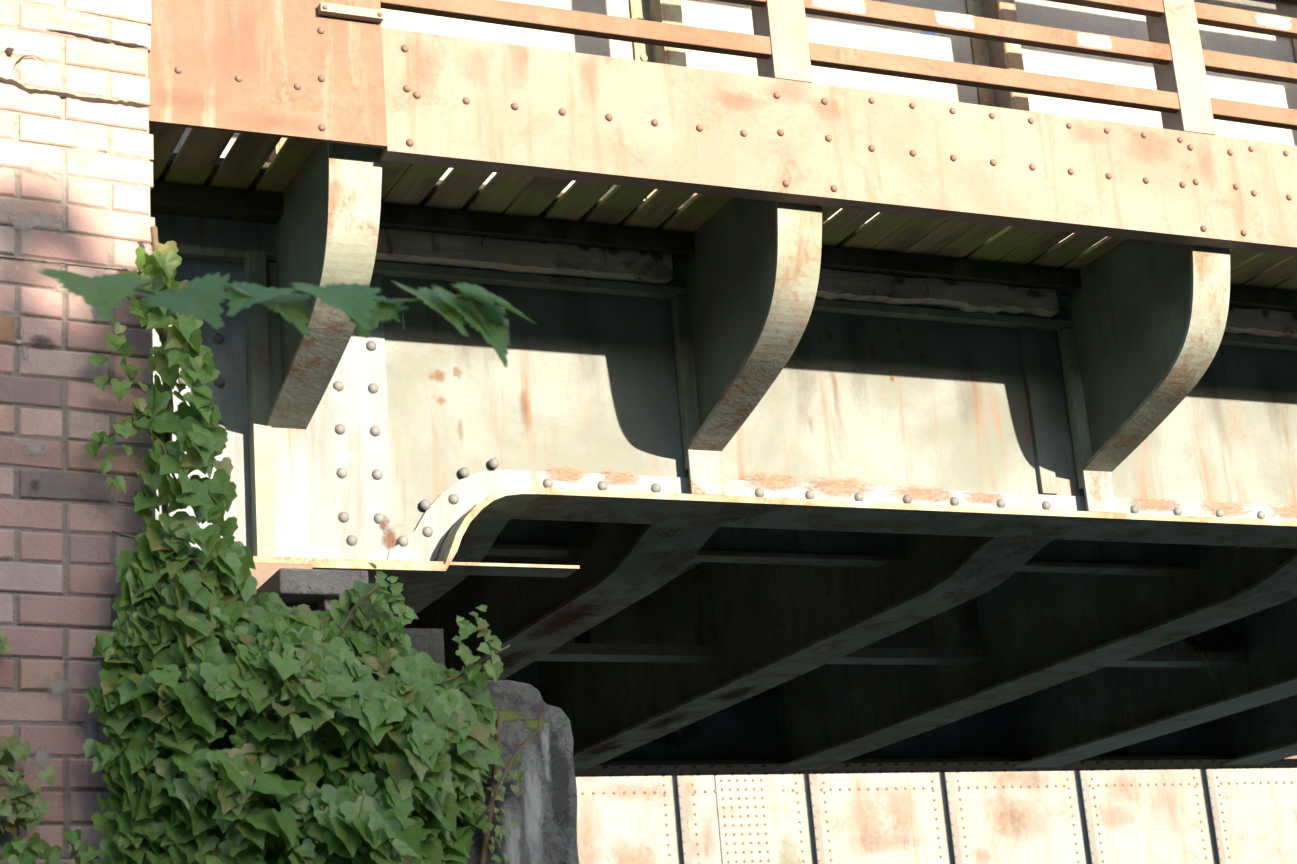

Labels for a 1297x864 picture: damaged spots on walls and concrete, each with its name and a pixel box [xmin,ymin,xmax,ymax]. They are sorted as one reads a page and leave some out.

corrosion [550,466,586,481]
corrosion [605,470,633,484]
corrosion [751,473,869,494]
corrosion [891,486,948,501]
corrosion [966,492,1001,503]
corrosion [1136,498,1179,510]
corrosion [1204,501,1248,516]
corrosion [1274,505,1297,518]
corrosion [648,716,700,746]